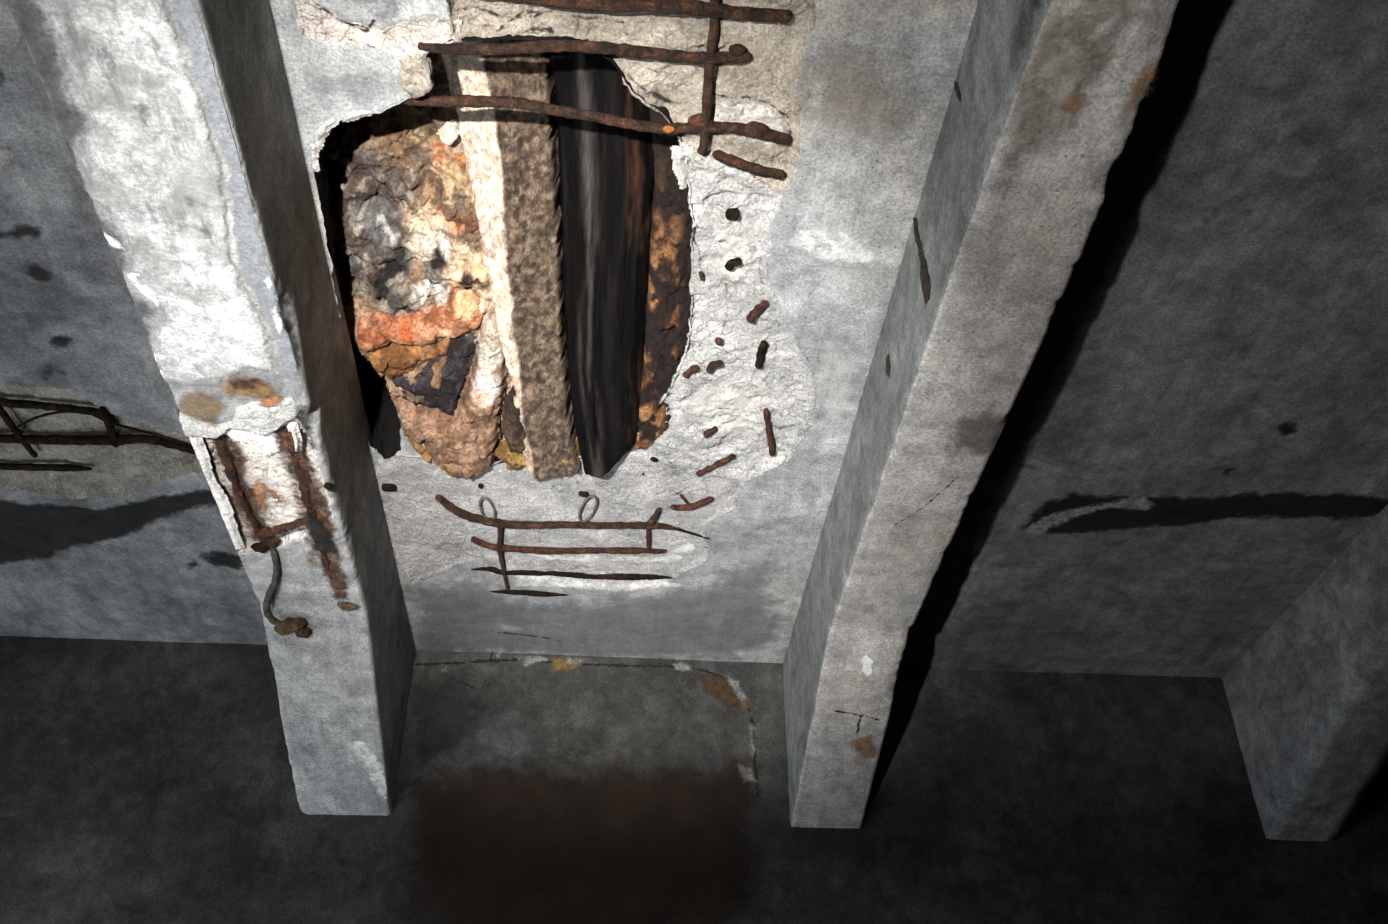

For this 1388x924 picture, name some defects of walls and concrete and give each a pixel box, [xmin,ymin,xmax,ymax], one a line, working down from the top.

spalling [295,0,817,591]
spalling [0,382,336,554]
corrosion [177,378,279,422]
corrosion [211,406,348,600]
peeling [337,602,359,611]